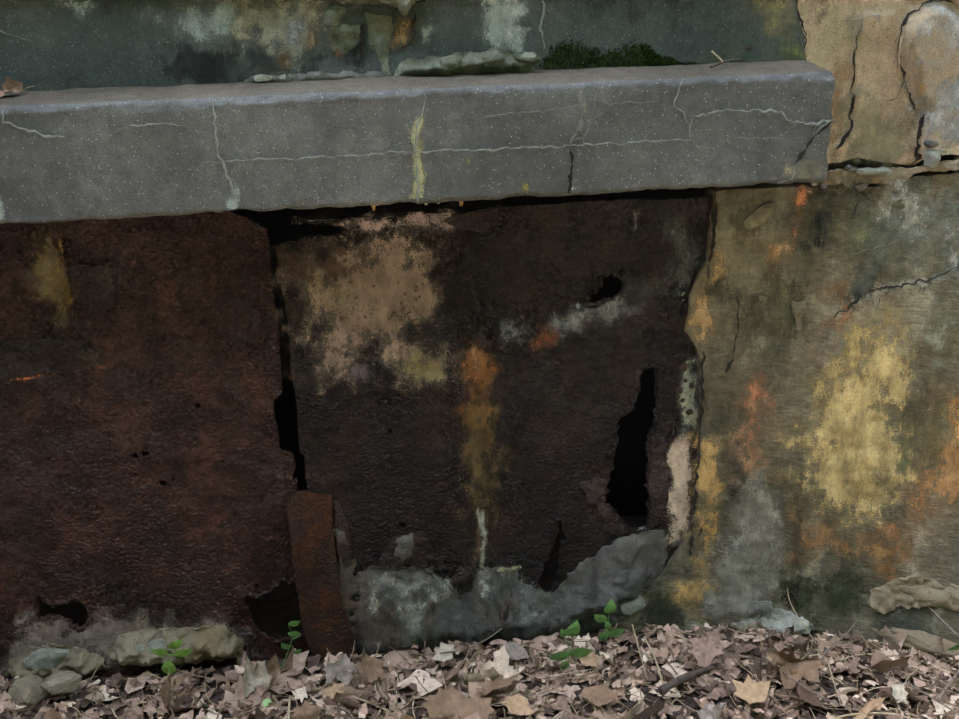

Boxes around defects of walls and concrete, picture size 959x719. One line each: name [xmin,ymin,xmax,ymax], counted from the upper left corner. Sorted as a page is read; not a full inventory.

crack [104,123,184,135]
crack [202,0,959,209]
rust [687,250,730,344]
rust [453,339,508,576]
rust [778,300,959,582]